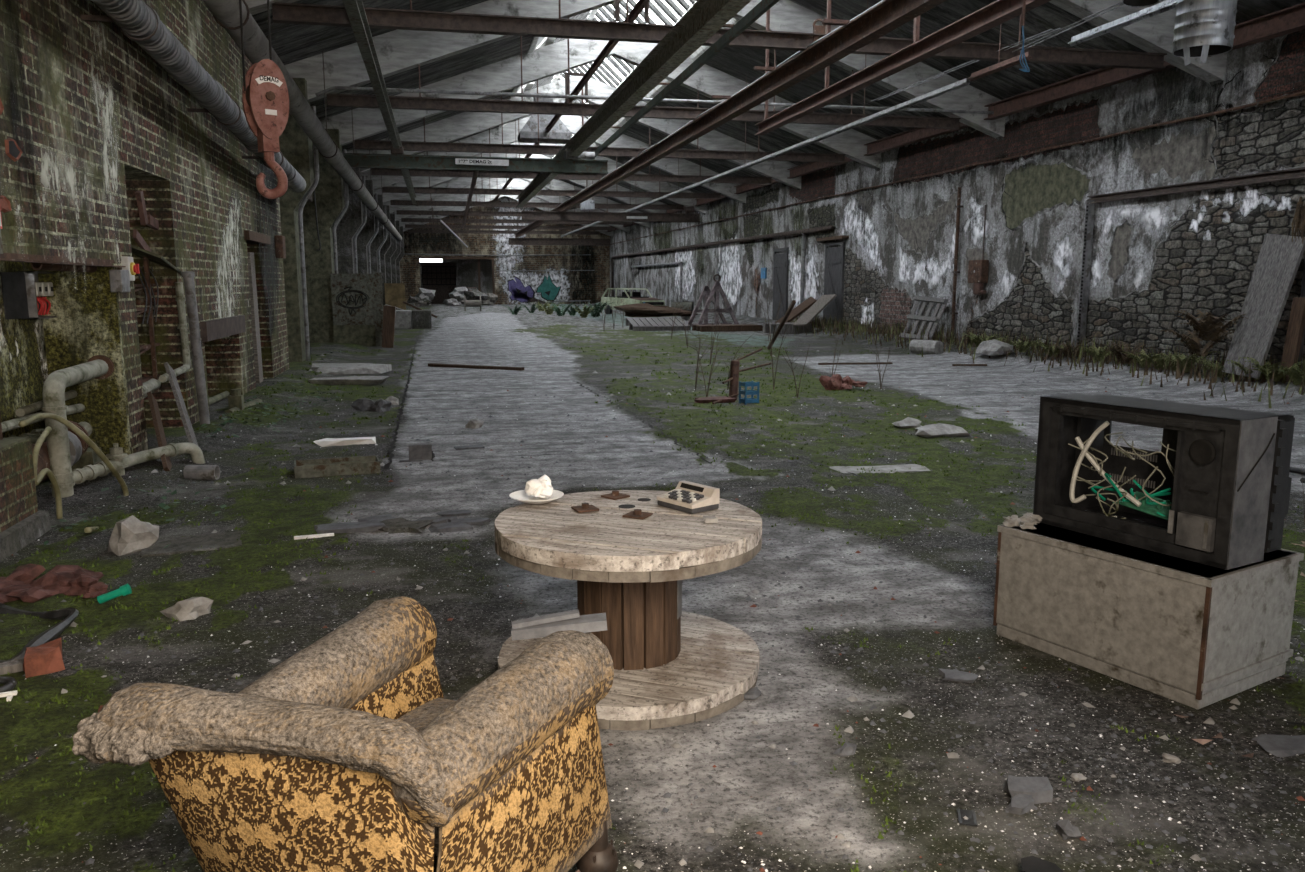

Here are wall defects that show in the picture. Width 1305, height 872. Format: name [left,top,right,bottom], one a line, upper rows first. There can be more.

damp [91,30,117,200]
spalling [892,29,1305,368]